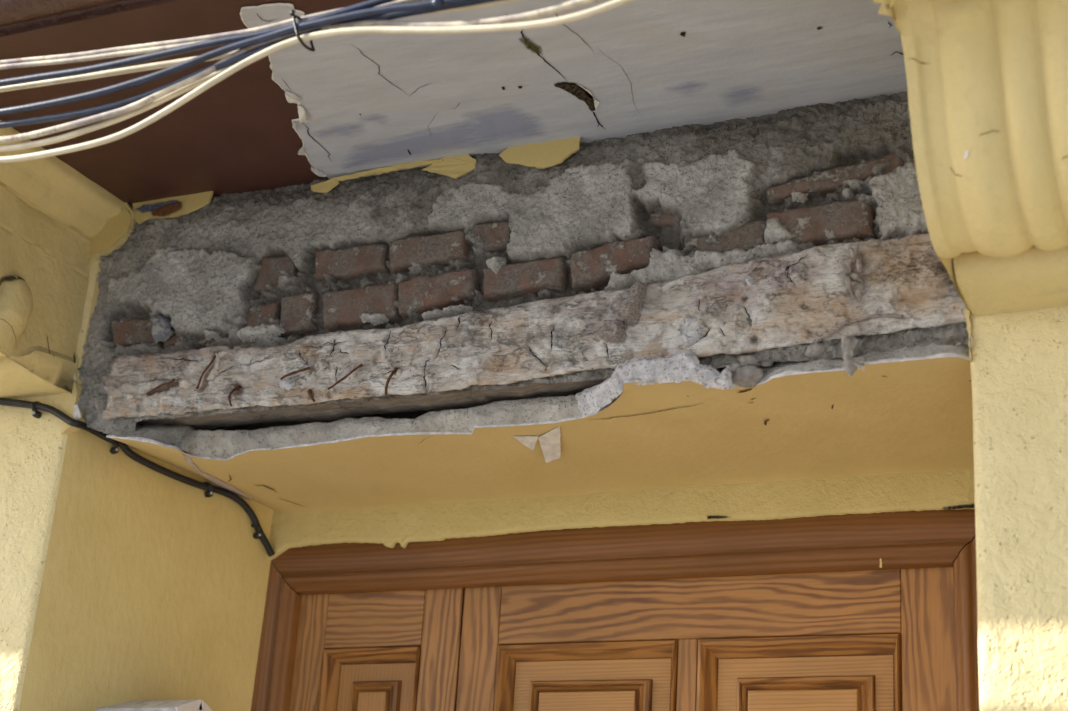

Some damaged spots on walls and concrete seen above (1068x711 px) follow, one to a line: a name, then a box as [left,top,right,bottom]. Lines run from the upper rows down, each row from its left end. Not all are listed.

crack [506,14,567,81]
rust [151,203,182,216]
spalling [59,0,973,500]
crack [384,317,460,390]
crack [527,327,554,371]